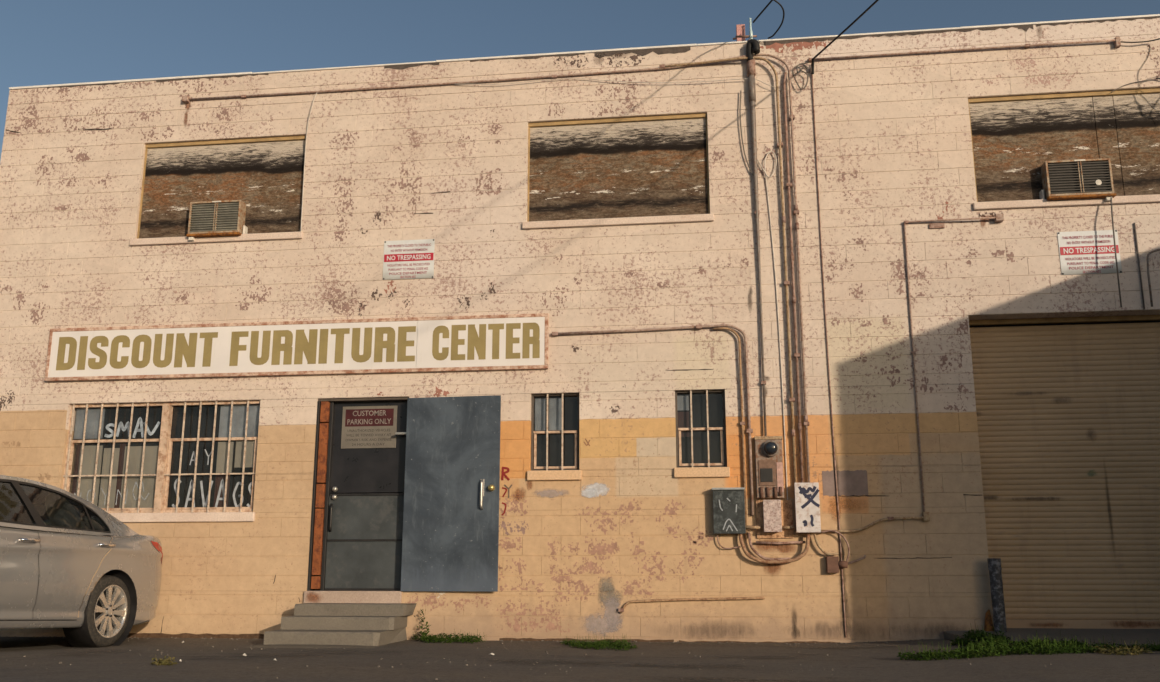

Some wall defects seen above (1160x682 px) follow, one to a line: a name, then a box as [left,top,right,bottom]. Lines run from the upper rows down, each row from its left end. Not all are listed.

peeling [554,53,645,117]
peeling [6,78,235,188]
peeling [199,101,243,134]
peeling [329,128,423,246]
peeling [0,283,50,325]
peeling [235,275,272,311]
peeling [323,278,410,317]
peeling [826,236,891,327]
peeling [890,255,973,304]
peeling [854,352,969,414]
peeling [405,494,838,643]